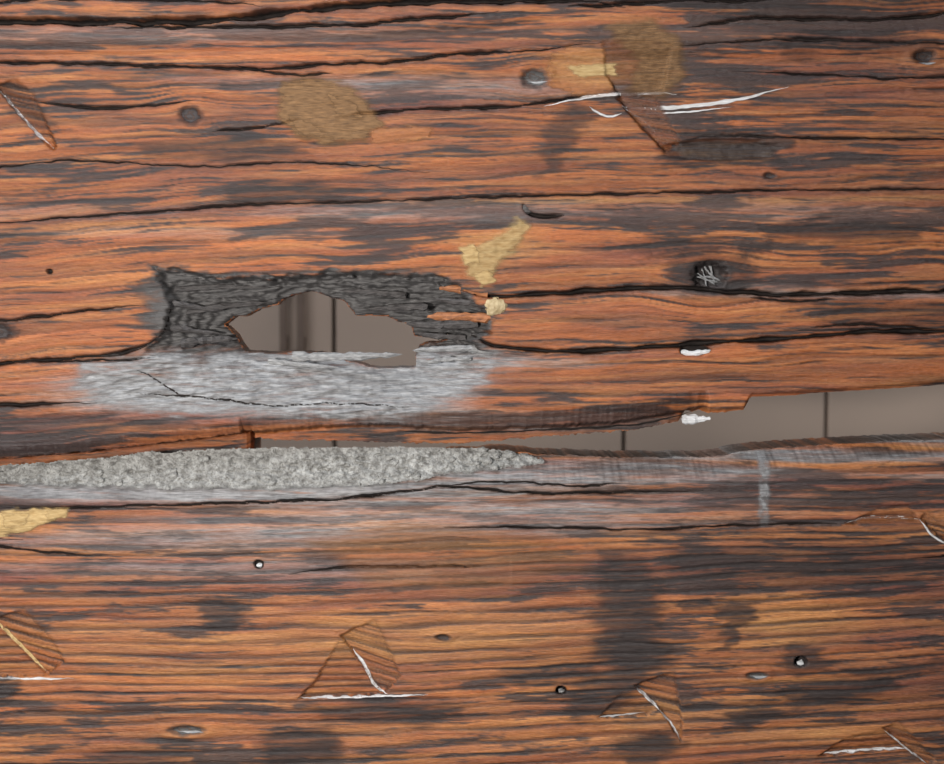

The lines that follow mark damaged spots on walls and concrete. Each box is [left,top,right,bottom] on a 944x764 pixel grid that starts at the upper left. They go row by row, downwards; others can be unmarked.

crack [0,0,944,46]
crack [0,42,602,77]
crack [731,71,944,80]
spalling [139,265,496,351]
crack [461,286,944,302]
crack [471,323,944,353]
spalling [0,609,74,680]
spalling [300,621,420,699]
spalling [600,673,681,741]
spalling [824,722,933,764]